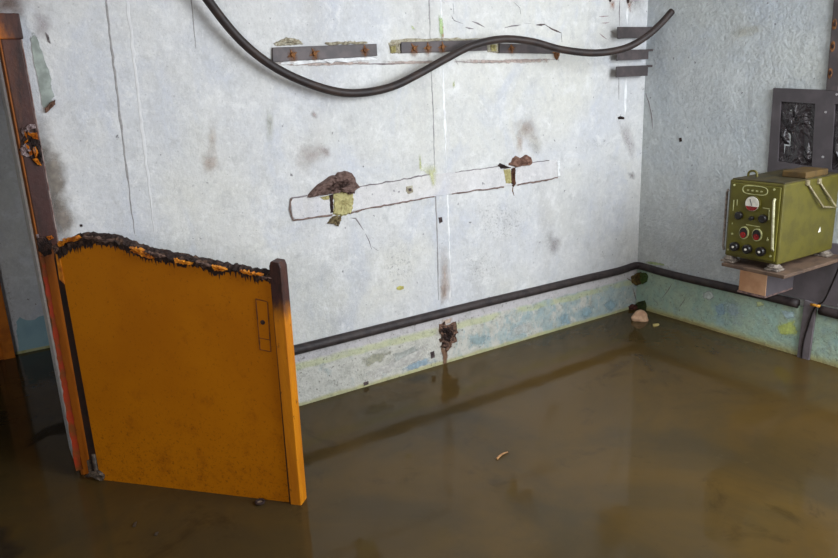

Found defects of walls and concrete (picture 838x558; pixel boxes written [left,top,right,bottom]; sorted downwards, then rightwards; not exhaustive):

peeling [31,32,55,113]
rust [280,45,378,66]
rust [394,26,447,64]
rust [473,44,560,63]
spalling [19,124,43,166]
spalling [497,155,532,195]
spalling [307,171,360,226]